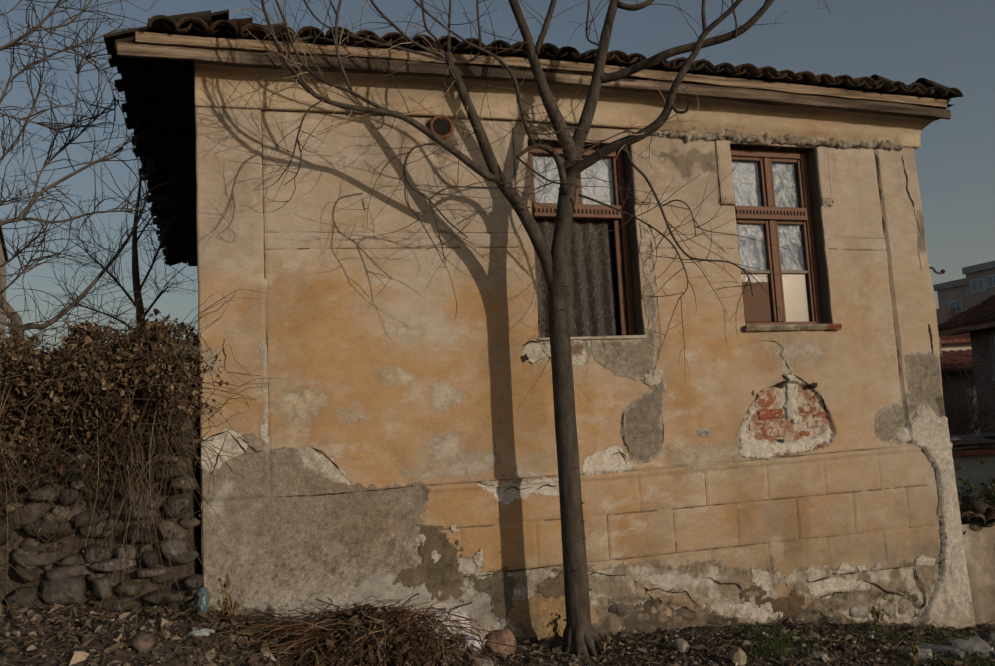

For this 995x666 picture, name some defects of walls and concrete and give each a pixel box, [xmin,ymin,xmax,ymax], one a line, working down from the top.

crack [651,134,878,149]
crack [902,155,922,271]
flaking render [522,339,551,365]
crack [762,340,831,415]
spalling [737,372,835,460]
flaking render [201,428,249,474]
flaking render [296,445,352,486]
flaking render [478,476,559,505]
flaking render [582,443,636,476]
flaking render [507,562,566,639]
flaking render [587,552,941,626]
crack [807,562,941,619]